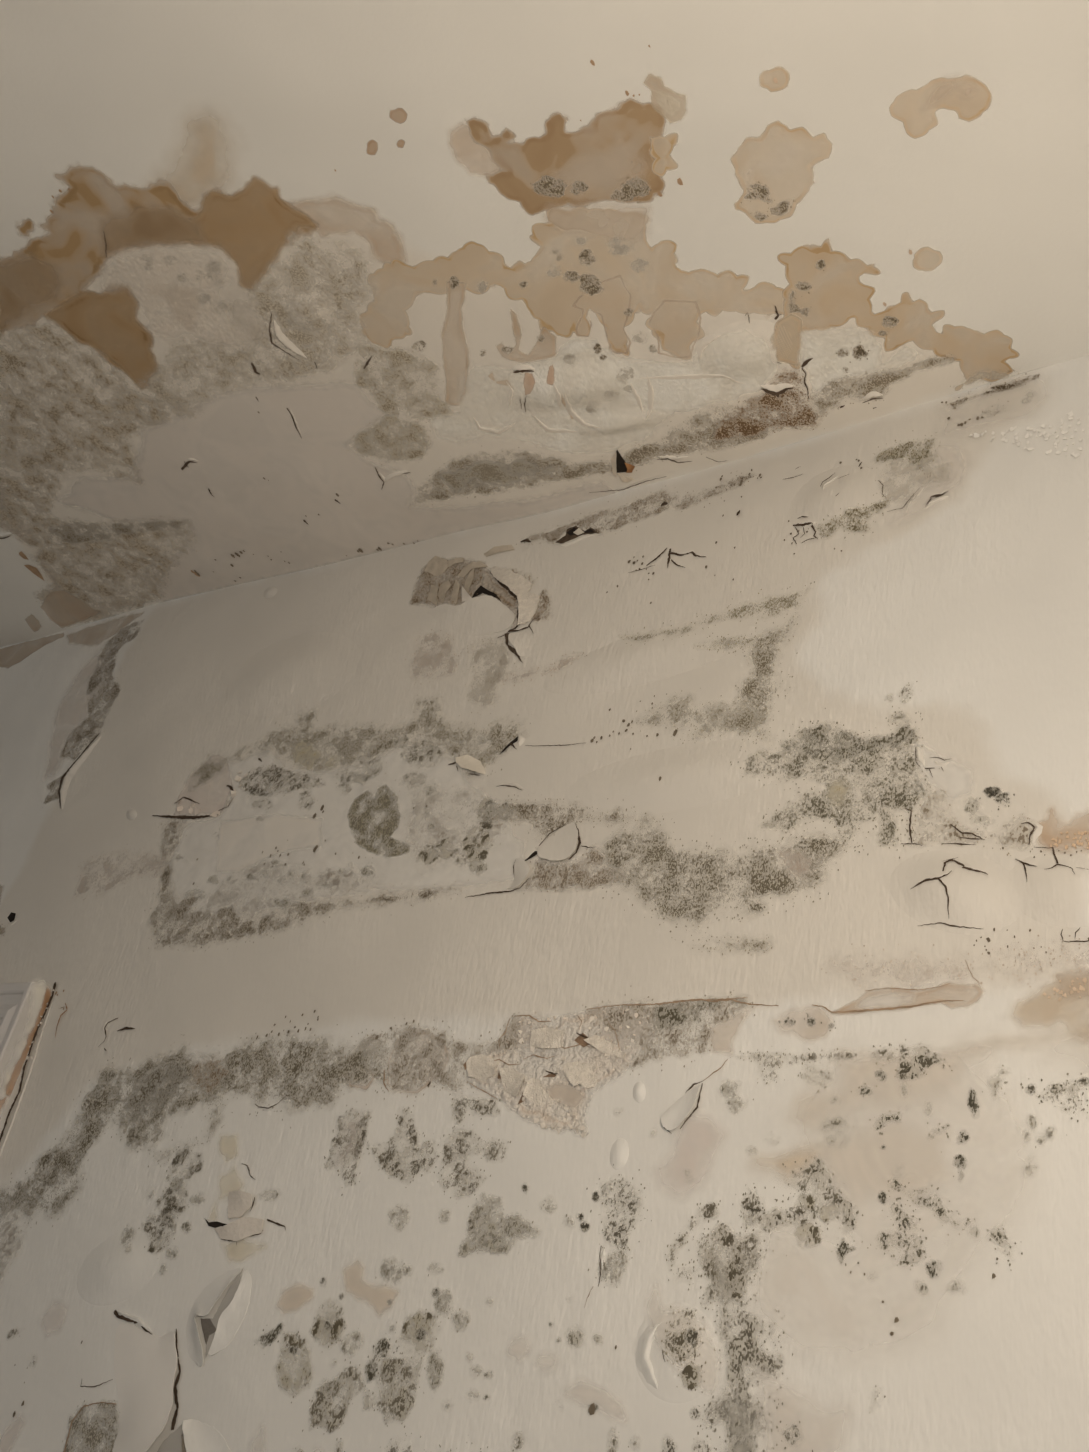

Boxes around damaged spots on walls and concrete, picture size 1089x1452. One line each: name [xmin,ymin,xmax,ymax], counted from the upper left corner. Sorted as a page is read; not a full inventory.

damp [760,67,789,92]
peeling [62,384,635,662]
damp [0,75,1040,803]
crack [606,548,707,604]
damp [75,575,1033,955]
crack [901,808,1089,955]
damp [0,1010,652,1288]
flaking render [463,1001,658,1138]
damp [582,935,1089,1452]
damp [62,1400,118,1452]
peeling [112,1268,252,1452]
damp [254,1260,469,1452]